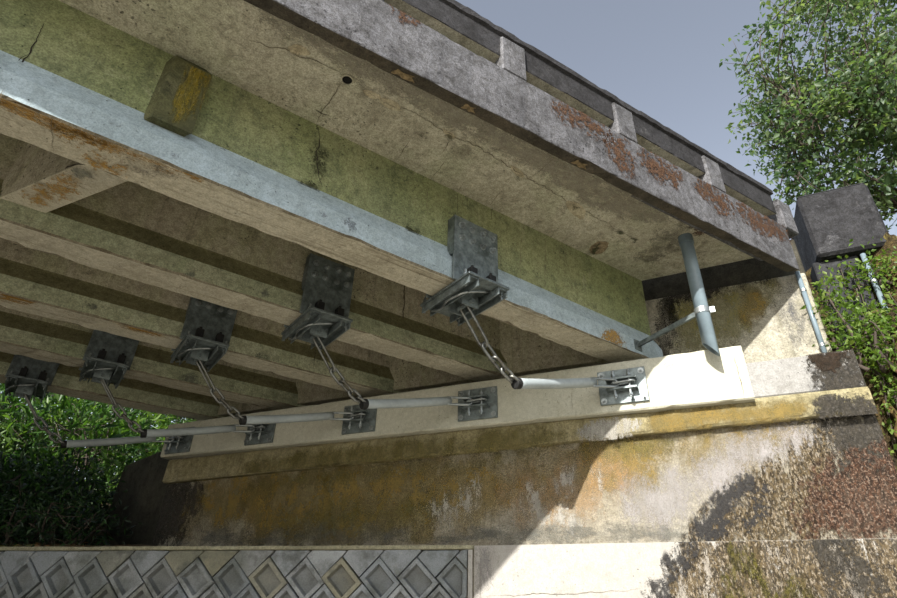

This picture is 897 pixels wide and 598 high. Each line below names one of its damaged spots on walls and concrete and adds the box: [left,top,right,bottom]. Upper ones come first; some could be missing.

crack [18,24,44,62]
rust [0,98,202,206]
rust [601,329,625,346]
leakage [171,400,828,546]